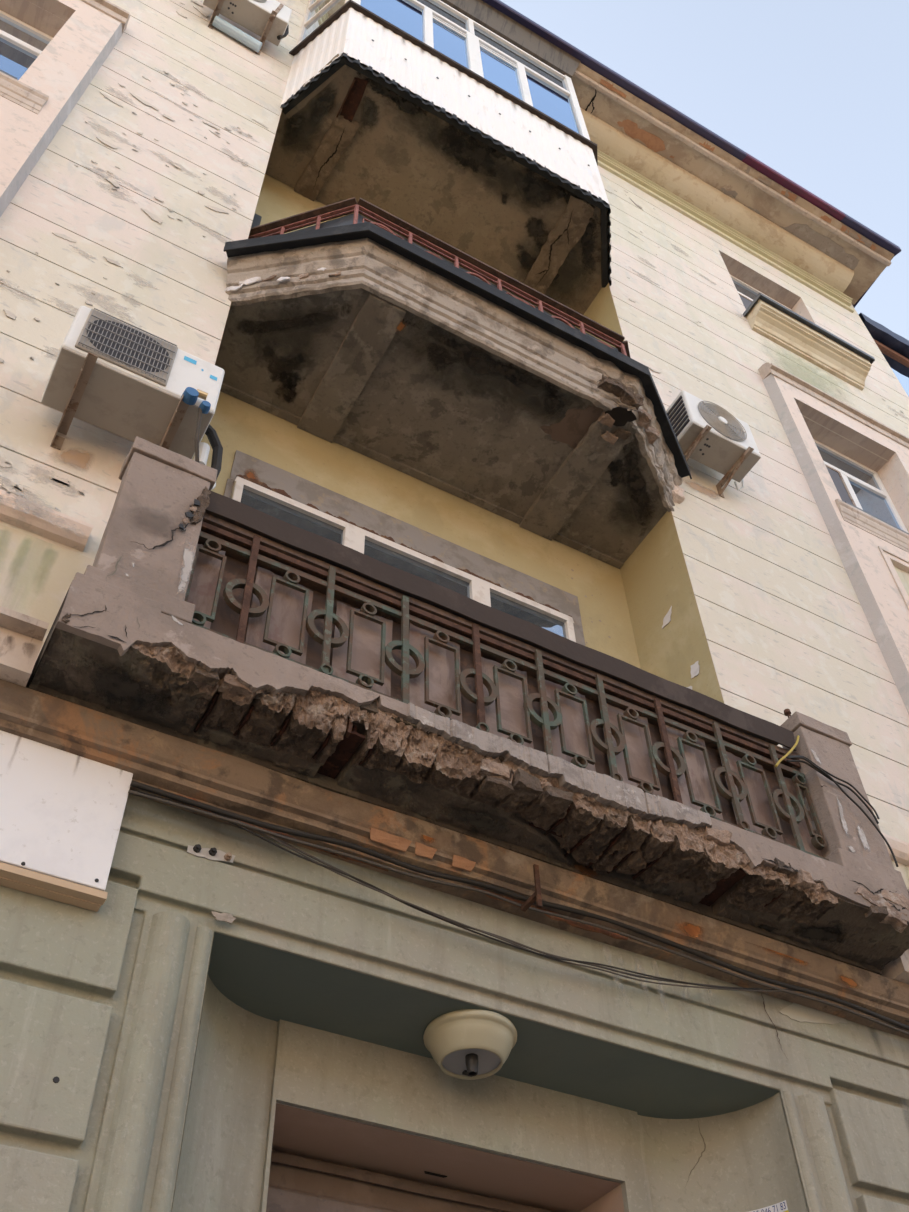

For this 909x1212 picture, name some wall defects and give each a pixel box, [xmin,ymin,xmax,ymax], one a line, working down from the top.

flaking render [451,855,631,941]